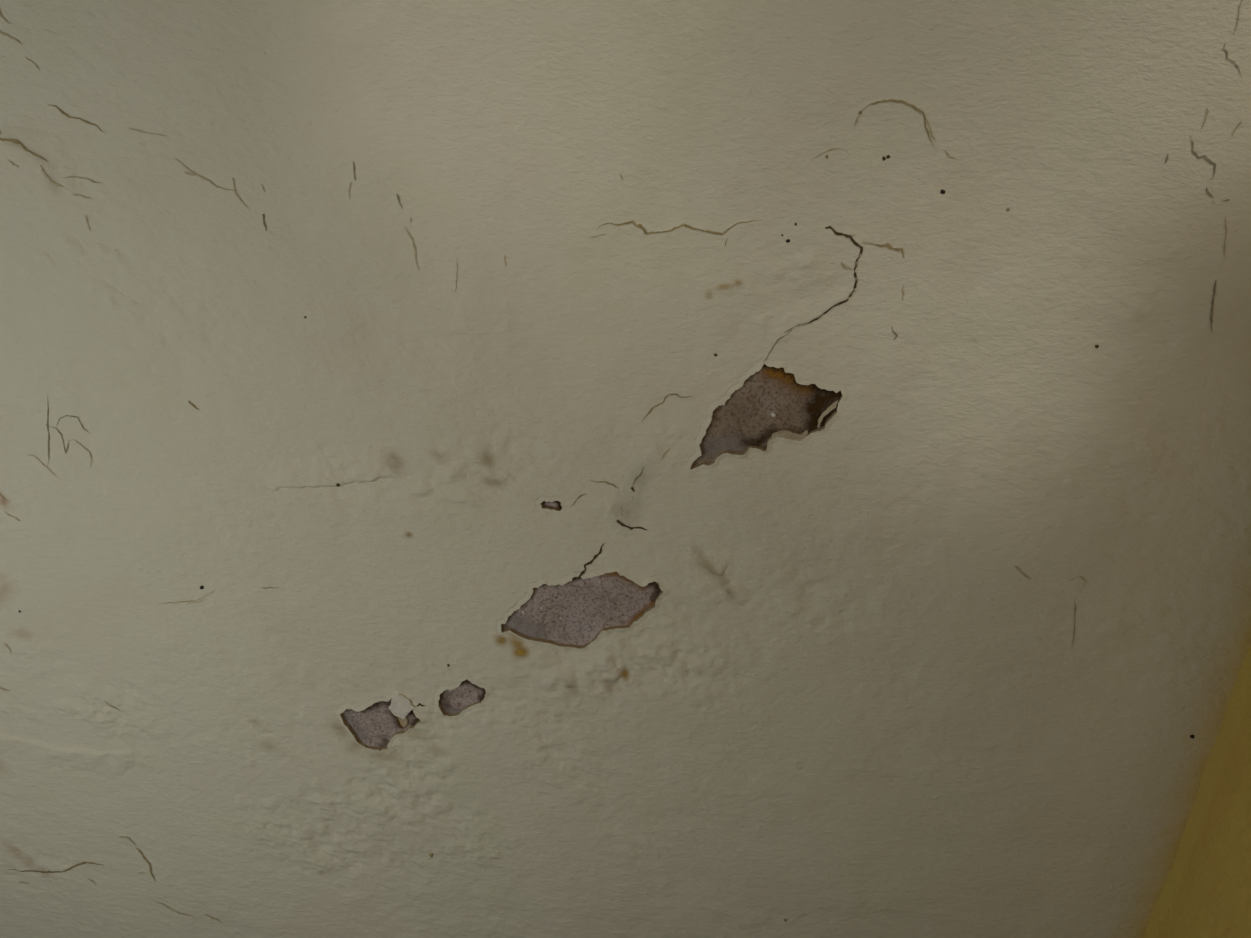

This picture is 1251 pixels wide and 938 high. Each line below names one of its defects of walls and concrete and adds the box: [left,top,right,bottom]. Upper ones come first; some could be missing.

crack [813,99,955,159]
crack [589,220,761,246]
crack [764,226,904,362]
peeling [685,358,849,474]
peeling [496,566,669,652]
peeling [336,675,491,755]